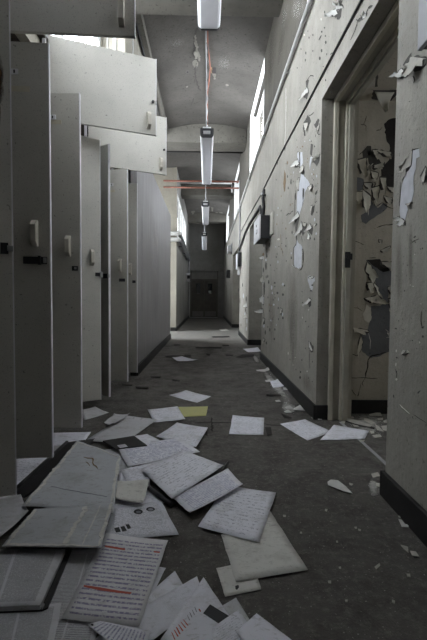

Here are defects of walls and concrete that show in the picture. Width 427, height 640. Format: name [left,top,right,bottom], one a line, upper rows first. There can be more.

peeling [321,0,343,20]
peeling [388,53,427,83]
peeling [357,118,427,227]
peeling [254,112,320,345]
crack [352,352,385,397]
peeling [353,259,404,381]